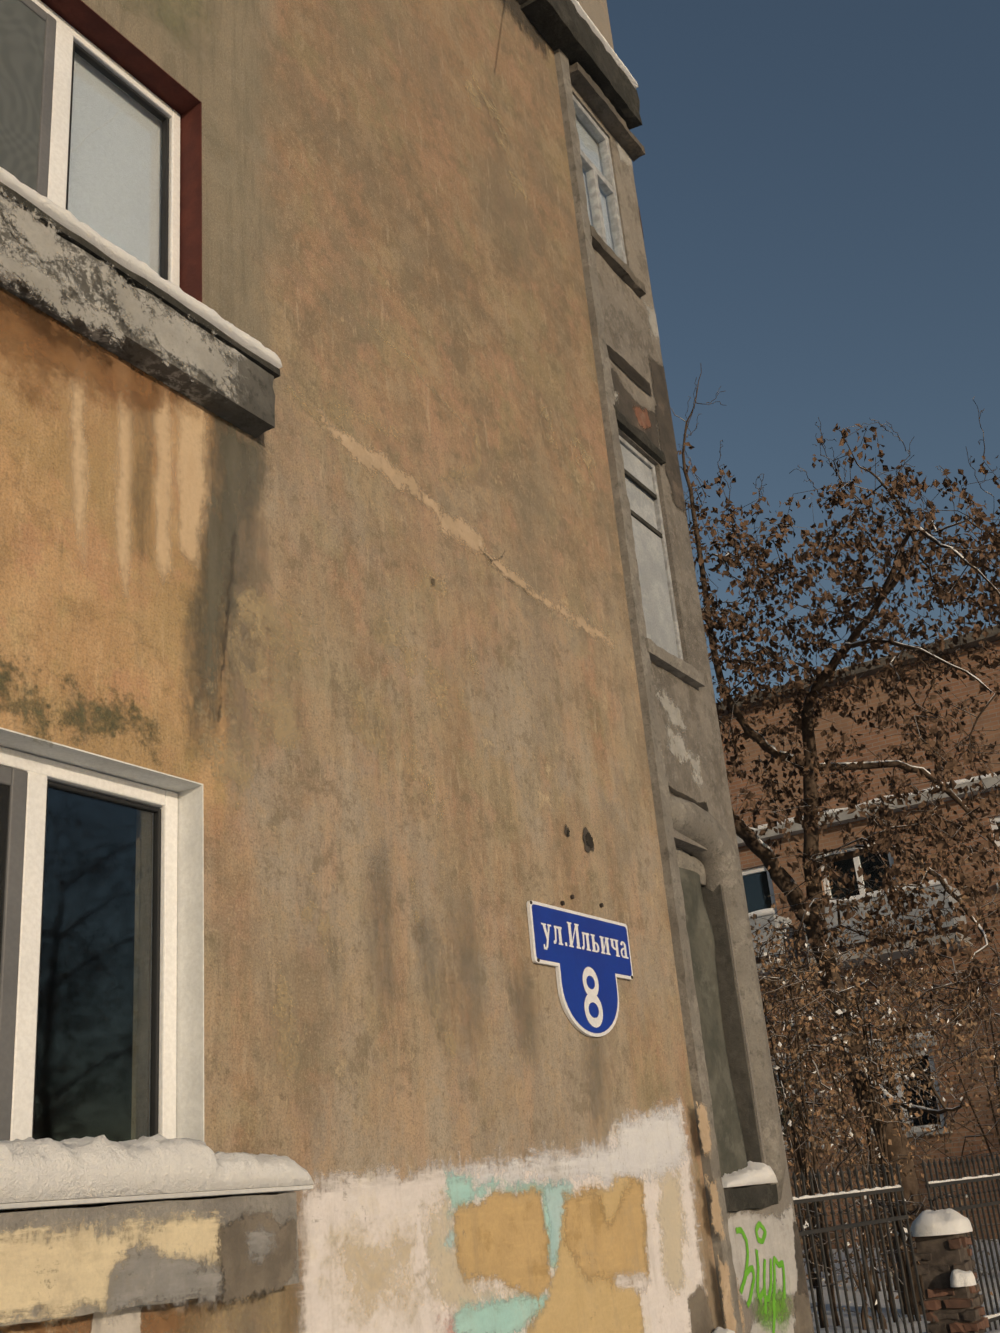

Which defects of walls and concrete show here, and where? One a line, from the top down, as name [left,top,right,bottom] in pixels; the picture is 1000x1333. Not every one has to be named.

peeling [0,188,238,403]
leakage [71,377,88,535]
leakage [116,388,264,727]
crack [300,392,615,649]
mould [0,661,153,741]